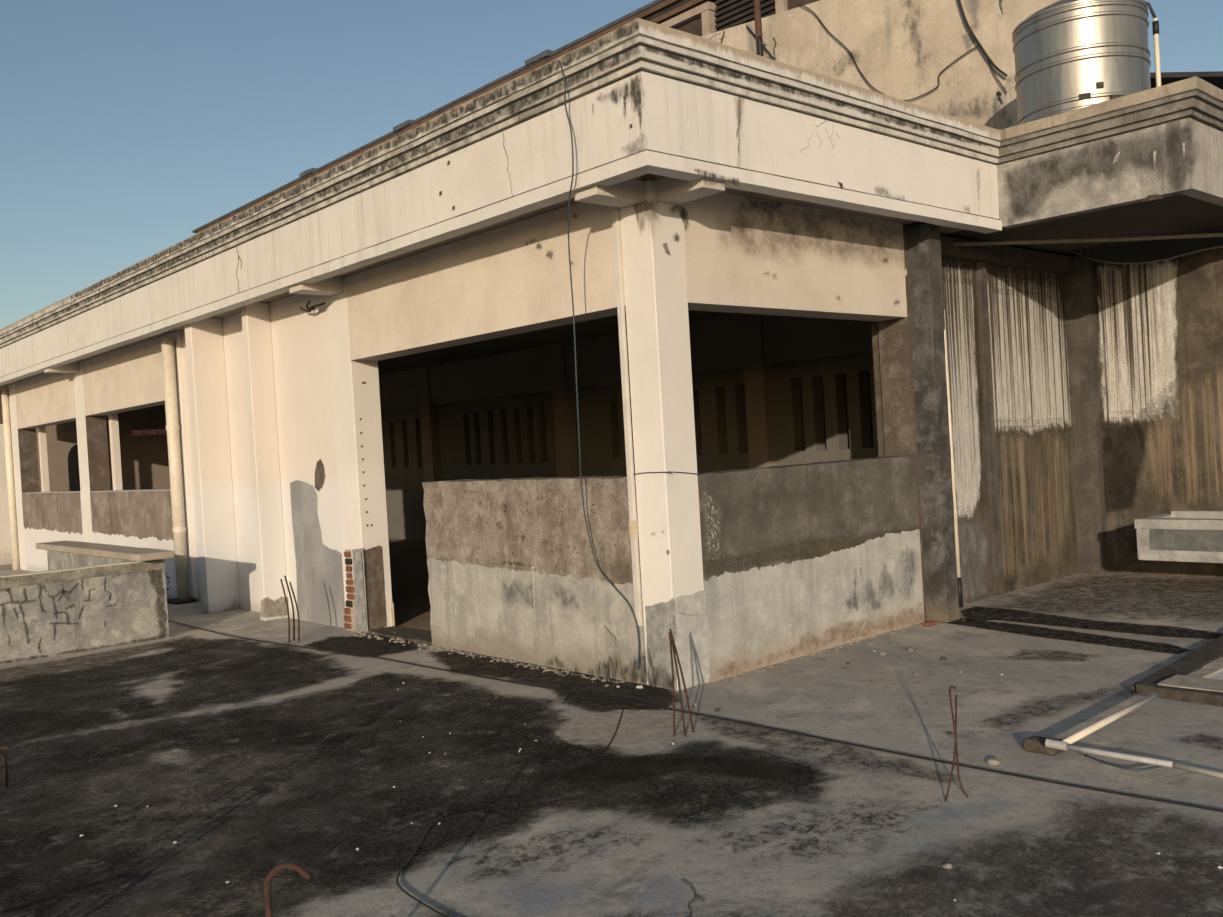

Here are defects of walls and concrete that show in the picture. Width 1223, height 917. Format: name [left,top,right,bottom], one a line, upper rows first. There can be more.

water stain [19,23,985,332]
water stain [1007,127,1197,222]
water stain [941,257,1074,573]
spalling [315,459,325,491]
crack [0,578,114,653]
peeling [344,545,387,632]